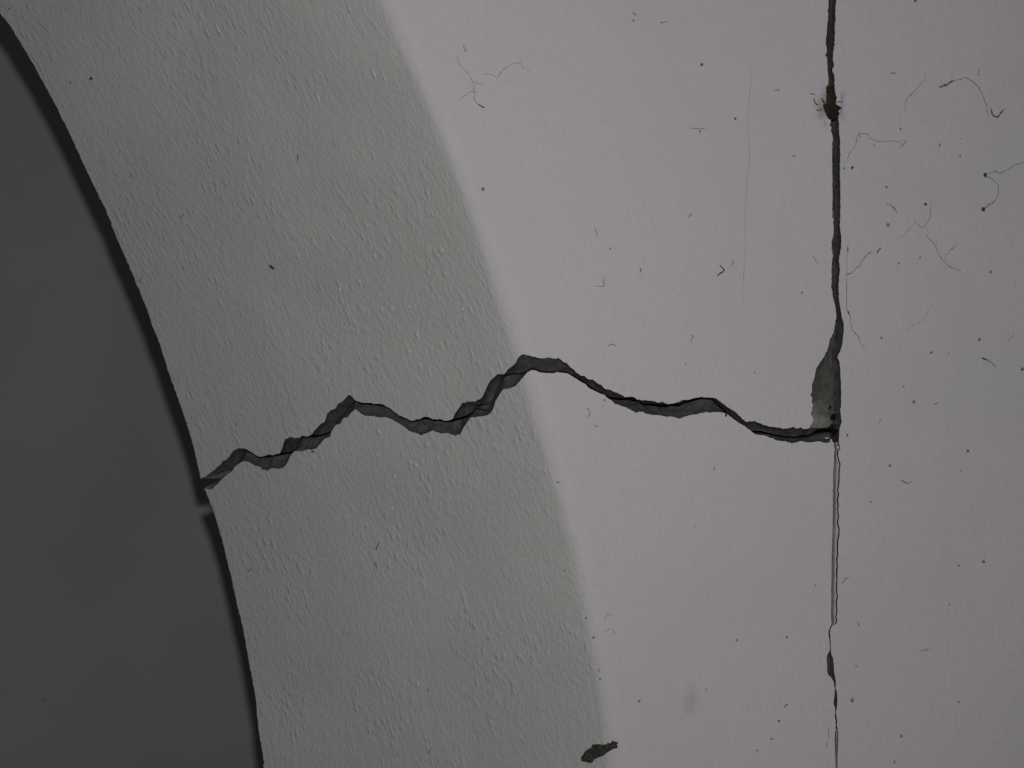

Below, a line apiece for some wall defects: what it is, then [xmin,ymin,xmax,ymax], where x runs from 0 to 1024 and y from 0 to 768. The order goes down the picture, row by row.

crack [202,0,863,730]
peeling [581,741,618,763]